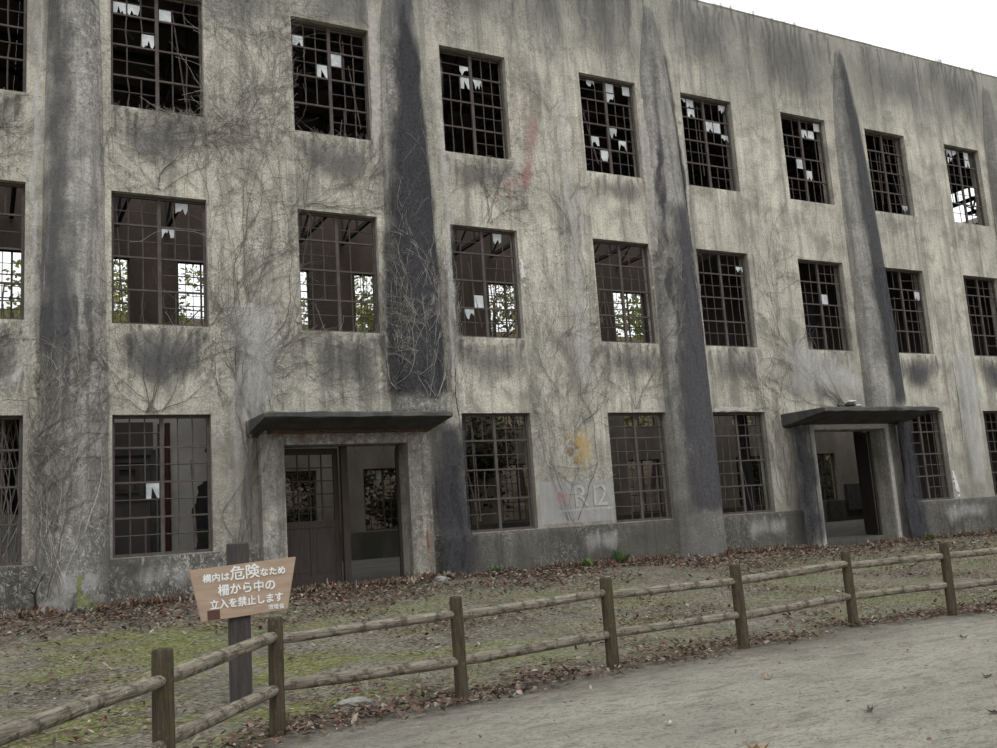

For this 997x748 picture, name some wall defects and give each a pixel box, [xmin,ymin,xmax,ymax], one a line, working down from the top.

water stain [49,0,69,85]
water stain [41,98,94,375]
water stain [129,325,205,380]
water stain [321,0,446,398]
water stain [655,50,753,509]
water stain [672,0,938,402]
water stain [912,56,984,106]